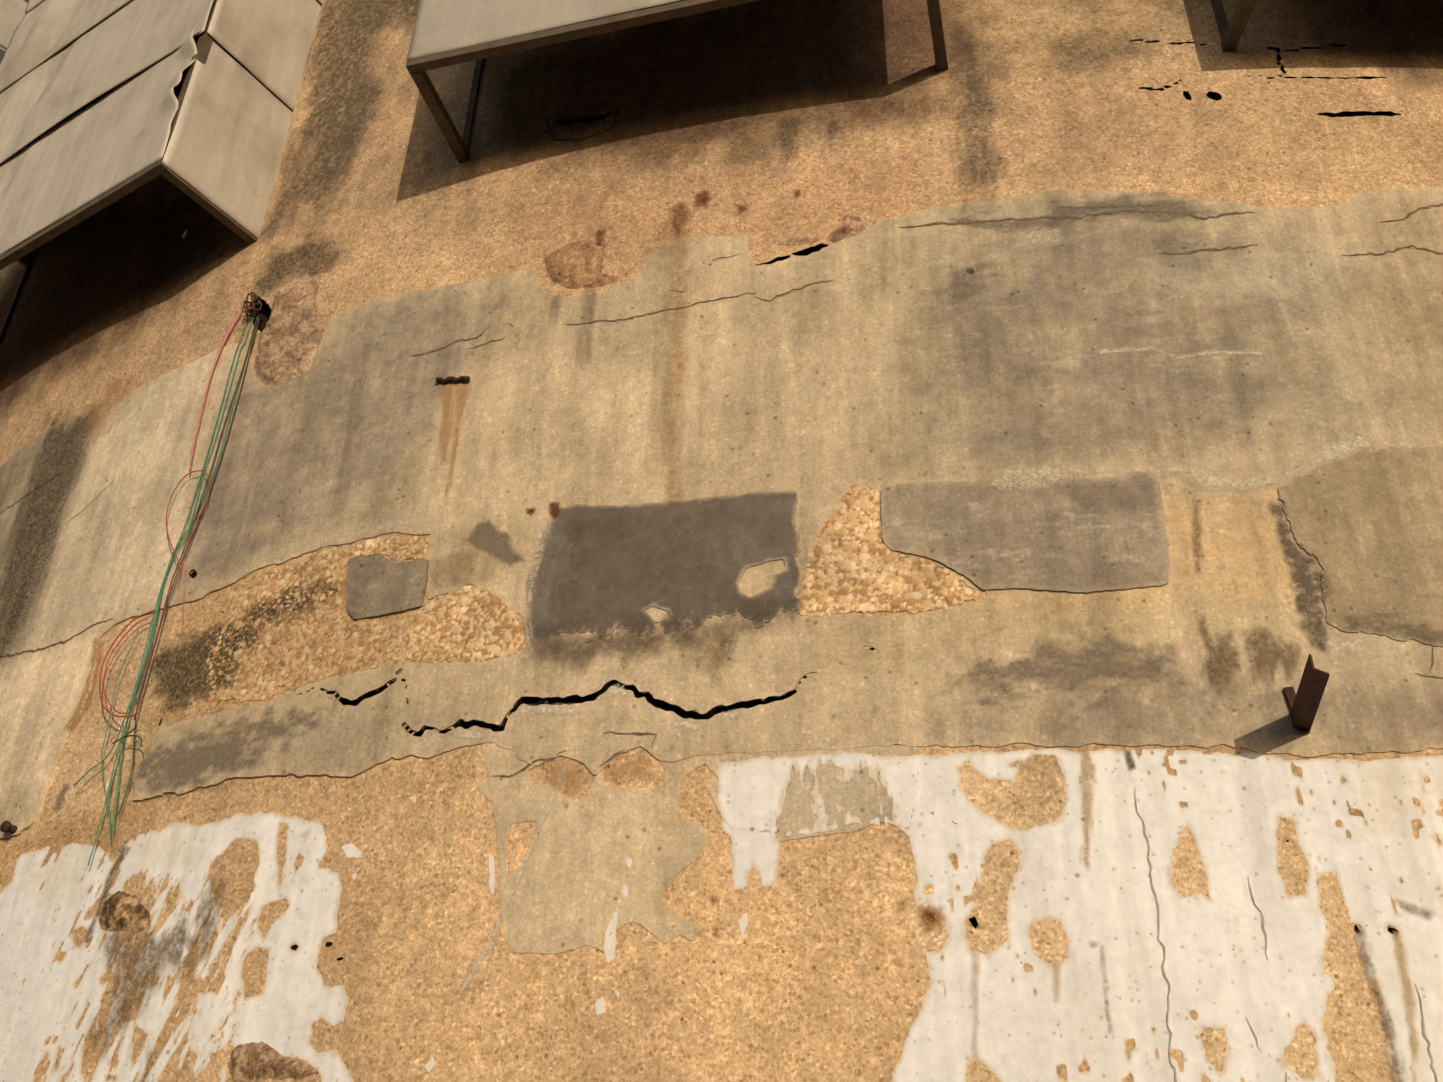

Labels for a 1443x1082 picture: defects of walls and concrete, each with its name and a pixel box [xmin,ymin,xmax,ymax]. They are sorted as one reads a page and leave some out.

spalling [253,272,325,387]
spalling [544,239,618,289]
crack [565,253,833,325]
crack [1344,203,1443,256]
spalling [795,484,985,618]
spalling [195,534,527,714]
crack [395,658,796,767]
peeling [0,810,354,1082]
peeling [717,748,1443,1082]